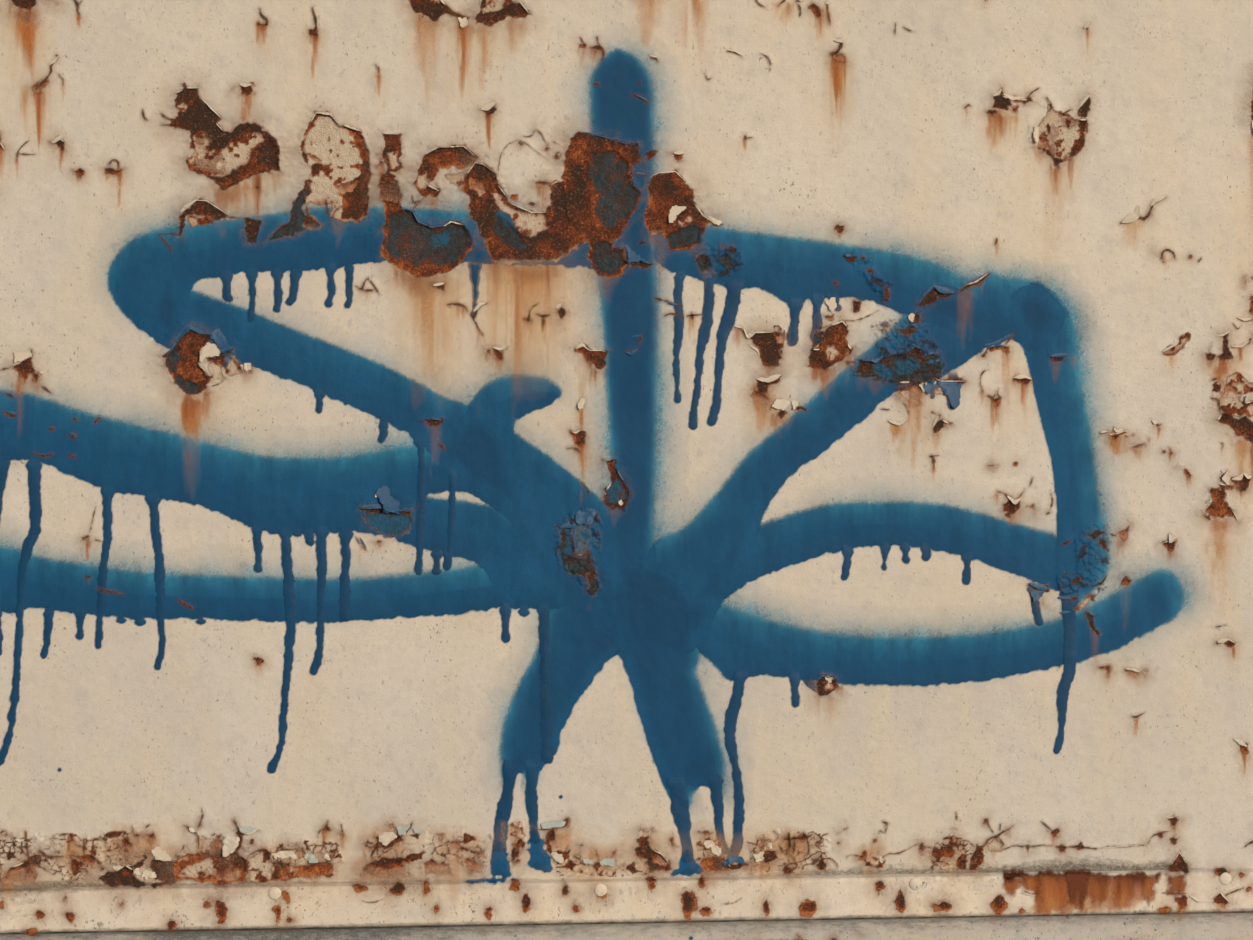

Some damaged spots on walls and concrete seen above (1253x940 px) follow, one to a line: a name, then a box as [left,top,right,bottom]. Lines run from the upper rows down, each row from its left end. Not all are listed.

rust [409,0,530,81]
peeling [481,102,497,144]
rust [159,82,280,250]
peeling [510,181,549,206]
rust [377,130,723,306]
peeling [696,244,740,275]
peeling [357,486,412,547]
peeling [556,459,629,596]
peeling [1028,526,1130,635]
rust [98,833,249,924]
rust [930,816,985,871]
rust [990,851,1252,915]